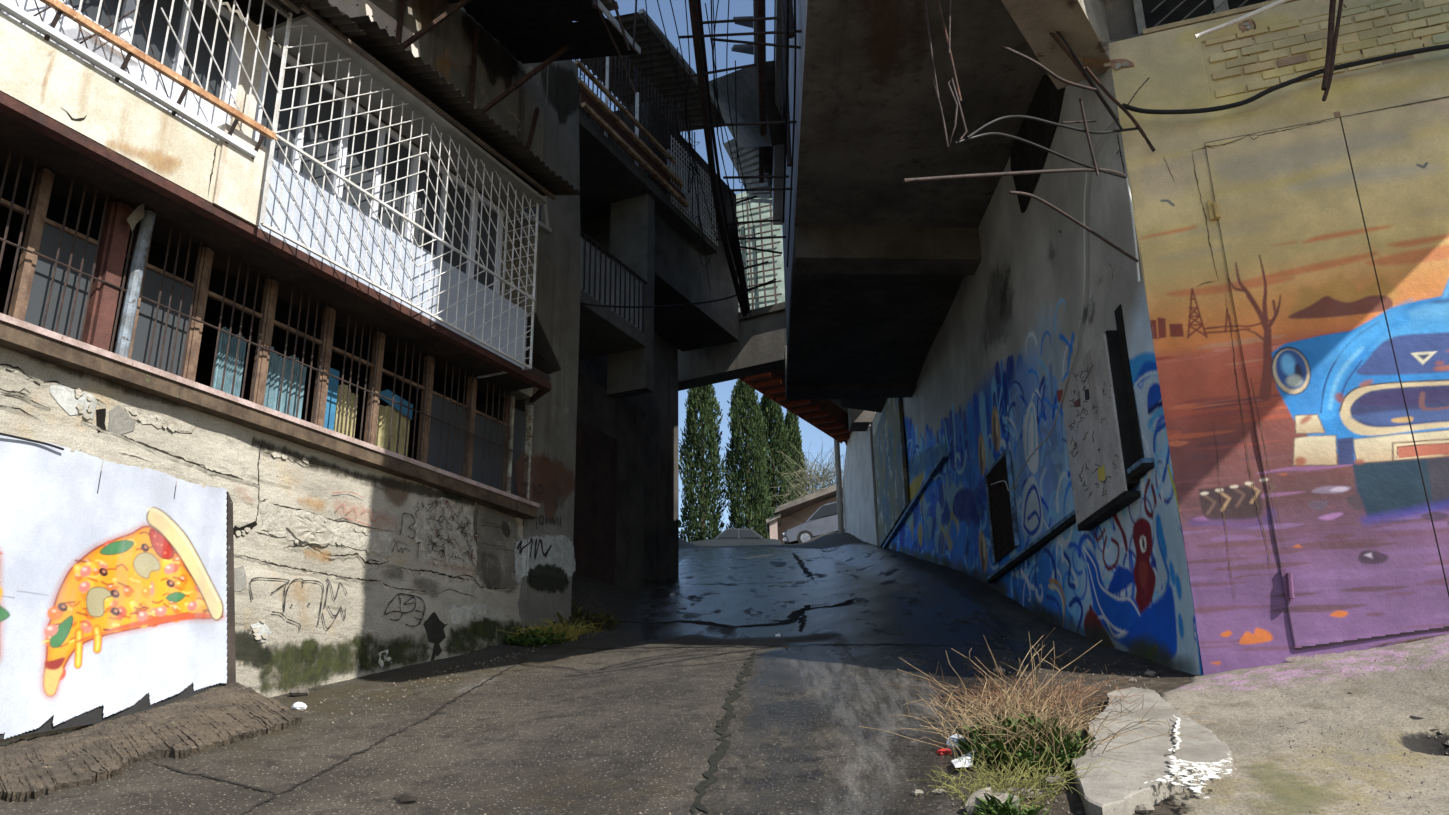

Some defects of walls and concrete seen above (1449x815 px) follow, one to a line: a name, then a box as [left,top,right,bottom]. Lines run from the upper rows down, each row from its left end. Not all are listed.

peeling [50,383,106,433]
spalling [124,407,195,433]
crack [0,364,518,598]
spalling [233,501,395,558]
spalling [413,495,478,573]
peeling [448,602,486,624]
peeling [250,619,272,643]
damp [475,618,496,640]
damp [301,639,318,663]
damp [354,635,372,666]